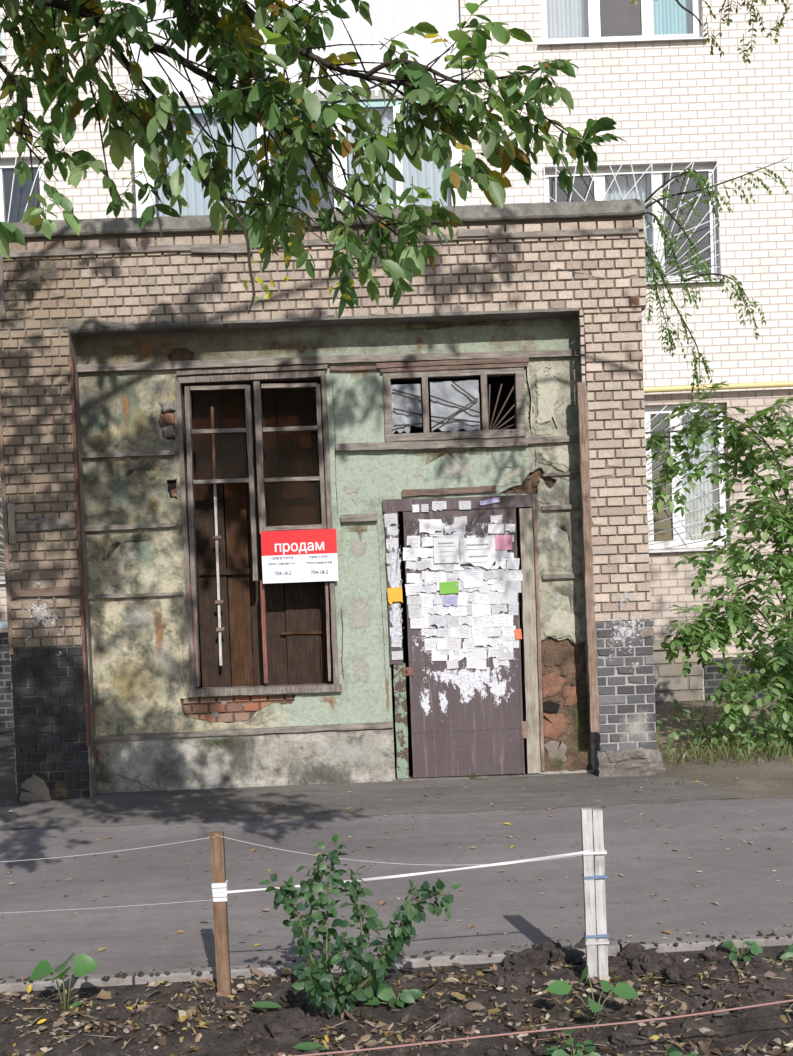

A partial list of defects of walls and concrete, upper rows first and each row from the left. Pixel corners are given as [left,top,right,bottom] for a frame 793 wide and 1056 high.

peeling [536,366,561,428]
spalling [157,400,177,441]
spalling [166,479,178,500]
peeling [492,446,576,504]
spalling [541,607,593,773]
spalling [178,694,297,730]
leakage [230,735,254,775]
leakage [297,766,349,784]